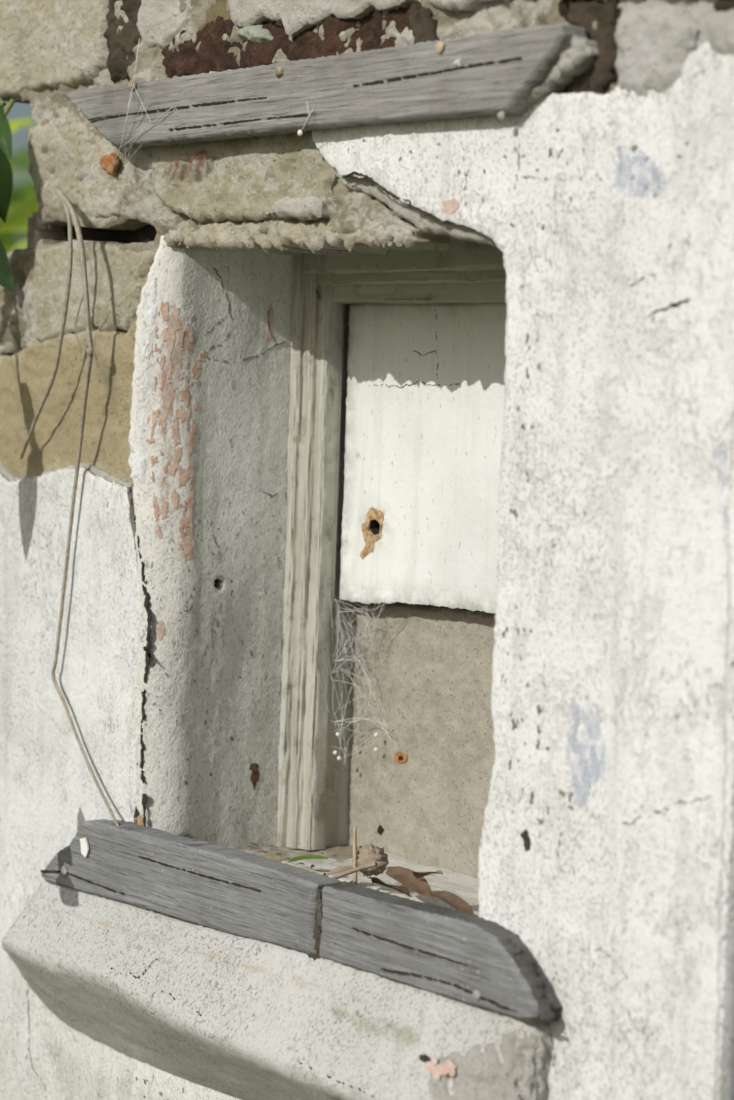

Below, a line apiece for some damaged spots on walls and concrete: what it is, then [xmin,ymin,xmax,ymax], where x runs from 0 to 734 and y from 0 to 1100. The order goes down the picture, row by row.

crack [514,130,548,189]
crack [335,172,441,221]
spalling [0,0,734,570]
crack [649,298,690,323]
peeling [155,620,165,641]
crack [130,486,155,827]
rust [249,763,260,790]
rust [394,752,408,763]
crack [623,403,734,1100]